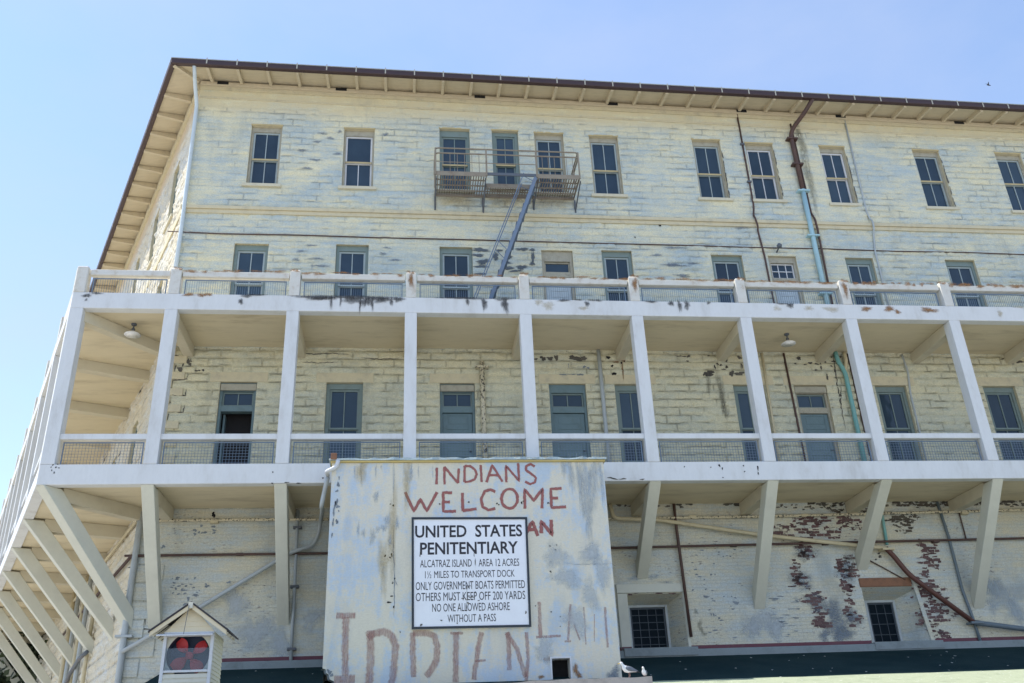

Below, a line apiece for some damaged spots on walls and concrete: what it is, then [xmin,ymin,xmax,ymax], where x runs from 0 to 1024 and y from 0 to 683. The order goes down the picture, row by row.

peeling [472,247,535,275]
peeling [534,355,589,375]
peeling [703,355,745,377]
flaking render [769,502,868,637]
flaking render [885,501,959,639]